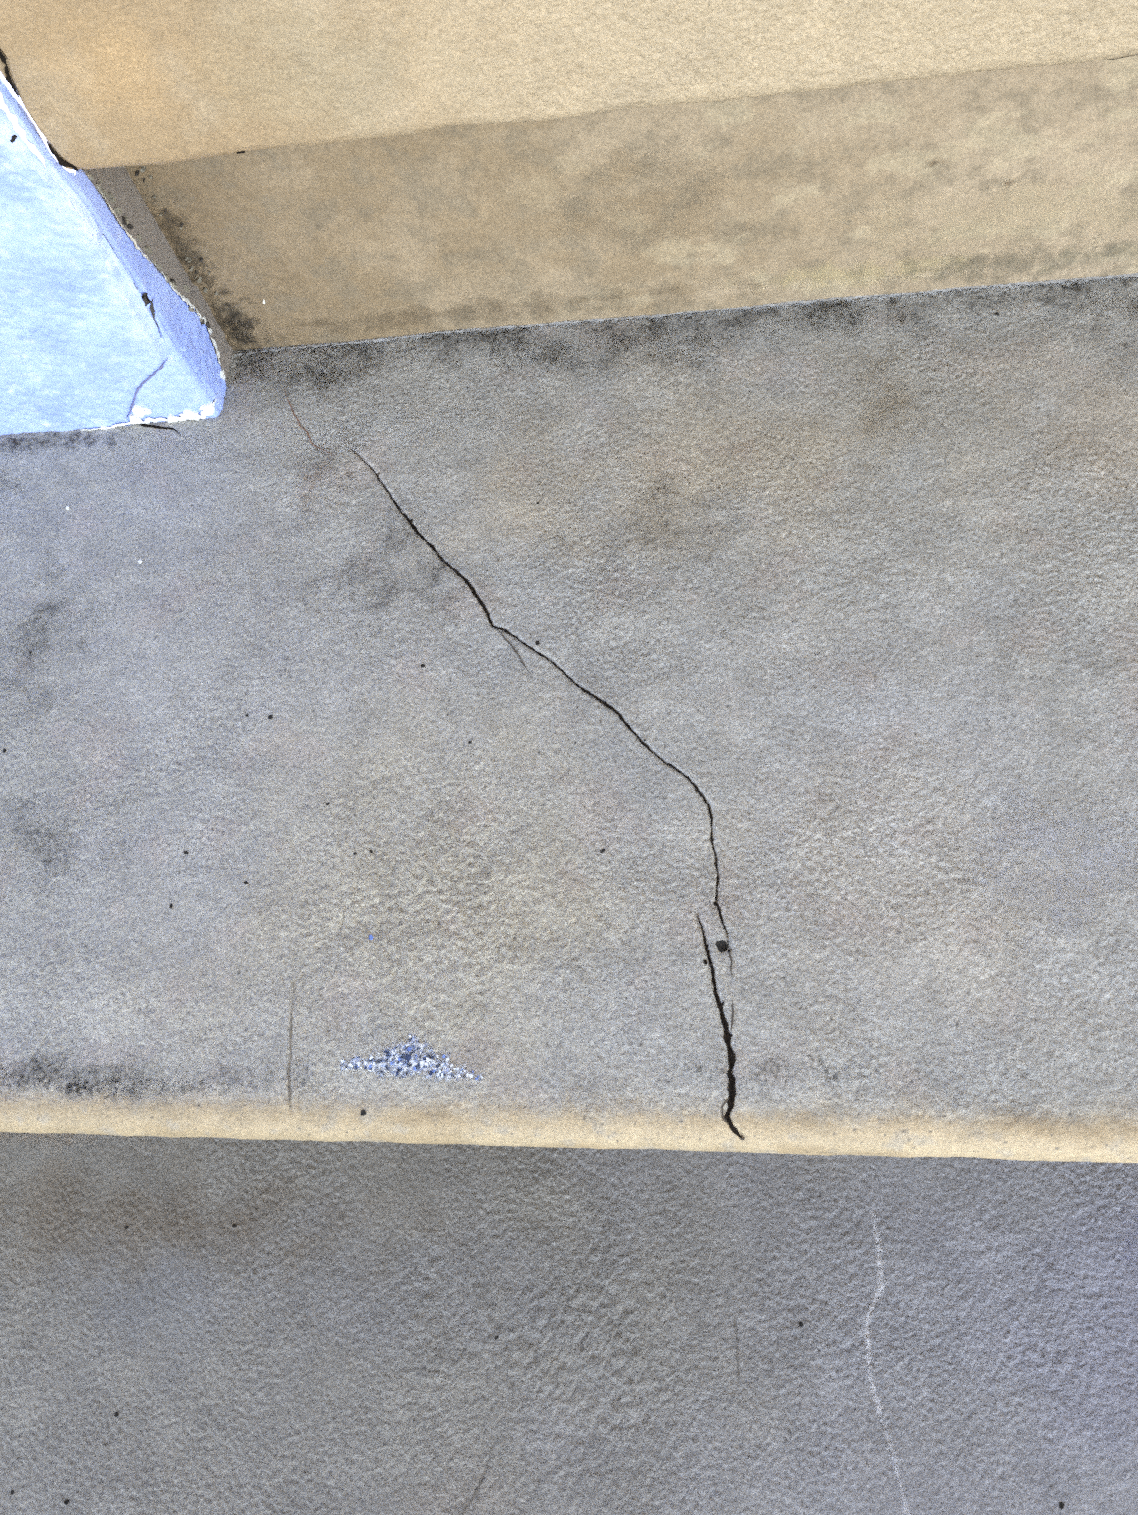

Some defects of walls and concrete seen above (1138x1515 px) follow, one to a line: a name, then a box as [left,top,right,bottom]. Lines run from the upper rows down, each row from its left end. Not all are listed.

peeling [341,1034,483,1080]
crack [284,389,745,1140]